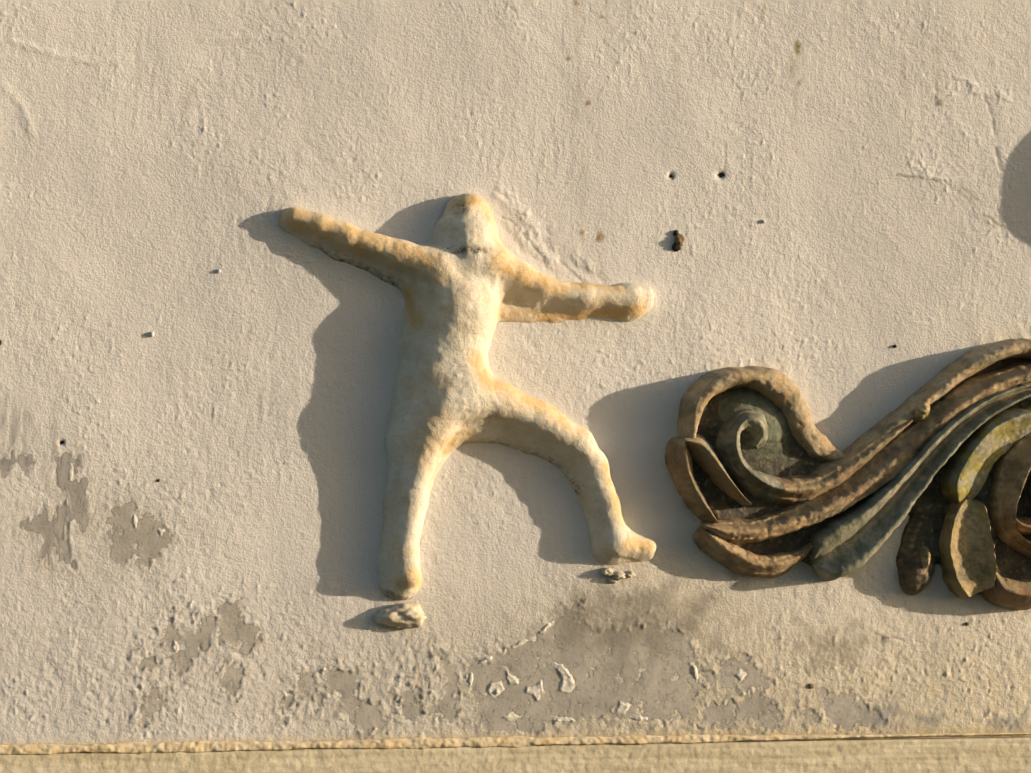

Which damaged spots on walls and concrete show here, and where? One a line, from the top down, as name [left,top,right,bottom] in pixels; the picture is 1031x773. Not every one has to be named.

peeling [20,452,89,569]
peeling [107,498,173,567]
peeling [138,688,167,727]
peeling [134,600,263,703]
peeling [396,603,784,738]
damp [603,592,662,649]